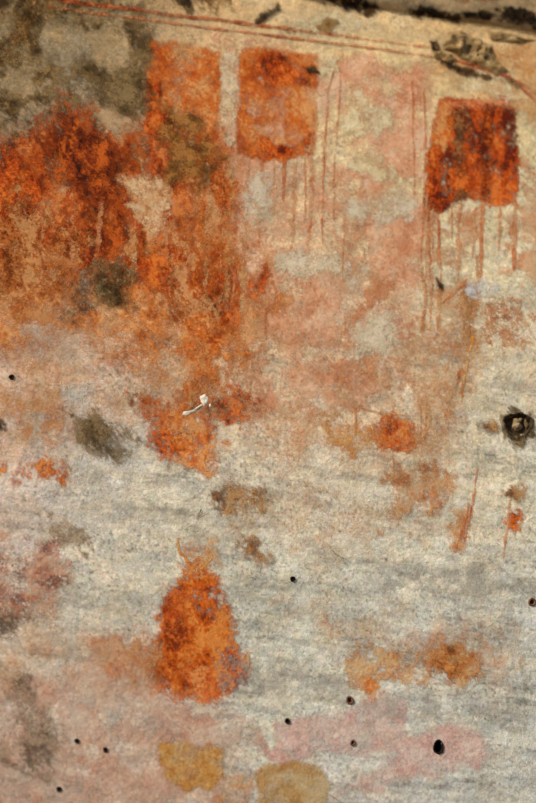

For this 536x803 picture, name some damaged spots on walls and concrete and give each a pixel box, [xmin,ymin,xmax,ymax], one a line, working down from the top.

damp [255,2,281,24]
damp [316,18,338,33]
damp [322,0,379,17]
damp [409,5,536,30]
damp [0,0,231,195]
corrosion [0,39,318,479]
corrosion [313,95,536,520]
damp [71,408,139,464]
corrosion [14,455,68,486]
corrosion [501,483,526,557]
corrosion [133,538,251,705]
corrosion [345,632,489,700]